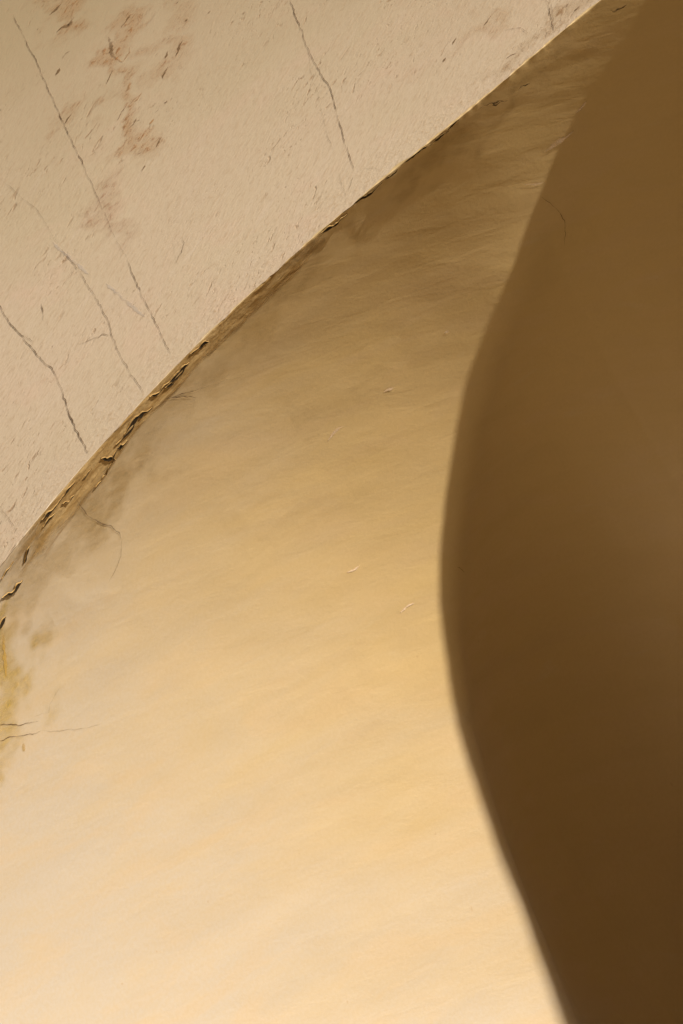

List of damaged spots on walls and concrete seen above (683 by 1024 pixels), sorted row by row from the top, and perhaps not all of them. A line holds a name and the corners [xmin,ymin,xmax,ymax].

crack [290,2,354,168]
crack [0,306,86,449]
crack [68,257,141,387]
spalling [1,241,313,580]